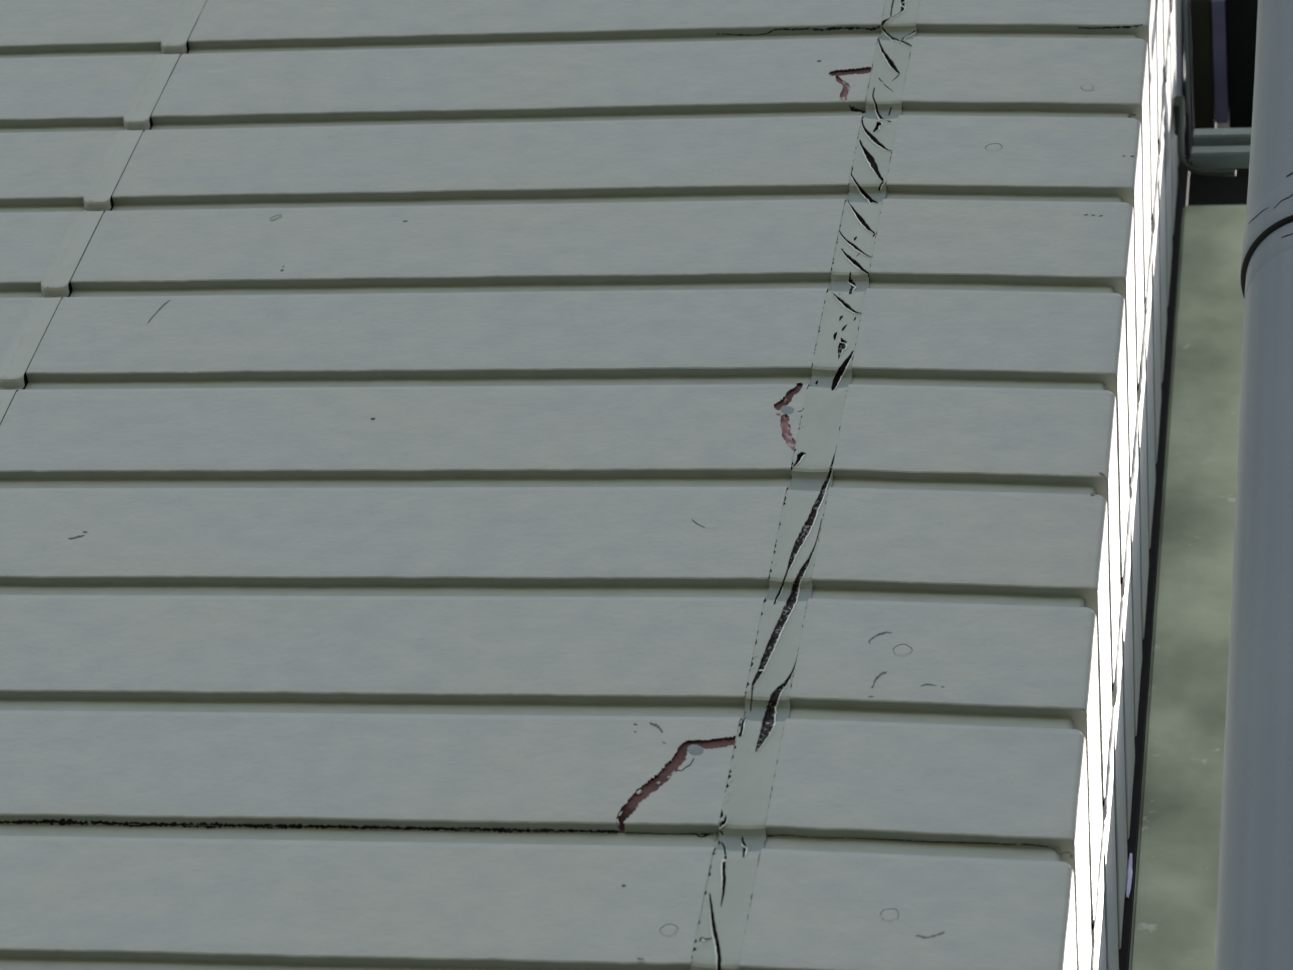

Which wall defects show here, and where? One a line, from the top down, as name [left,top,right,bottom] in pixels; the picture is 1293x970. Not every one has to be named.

crack [616,0,916,832]
crack [698,815,748,970]